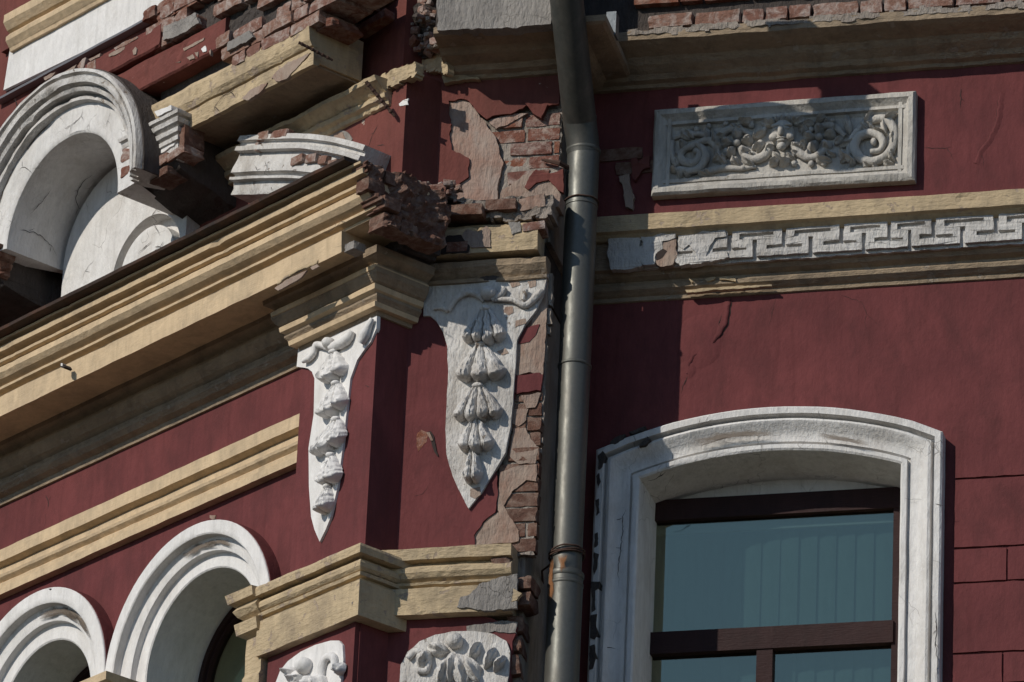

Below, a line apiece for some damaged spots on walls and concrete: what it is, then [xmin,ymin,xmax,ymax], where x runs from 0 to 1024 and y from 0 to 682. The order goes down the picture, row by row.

flaking render [44,0,396,81]
spalling [381,0,481,106]
peeling [155,105,184,117]
flaking render [120,148,130,178]
flaking render [149,124,205,190]
spalling [449,100,566,200]
flaking render [599,147,653,211]
spalling [607,230,773,295]
crack [682,297,732,387]
peeling [416,430,438,456]
spalling [457,273,554,680]
rust [548,556,566,597]